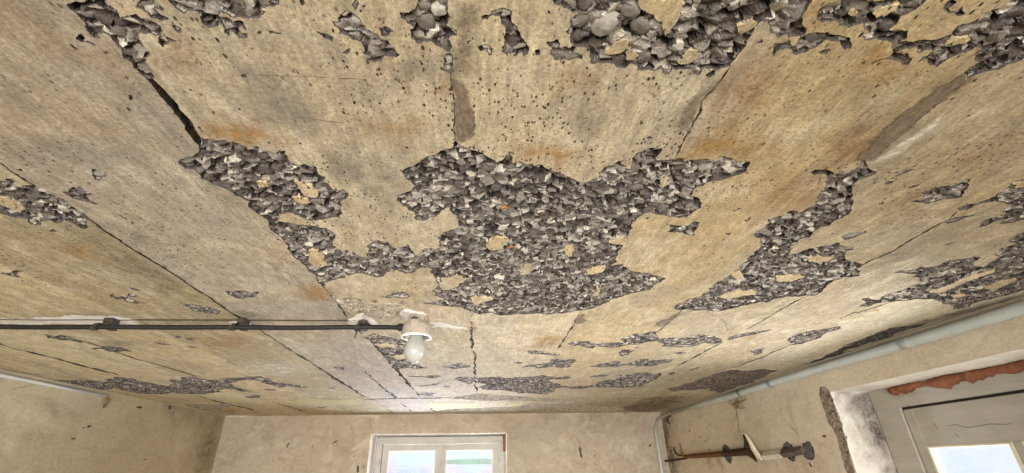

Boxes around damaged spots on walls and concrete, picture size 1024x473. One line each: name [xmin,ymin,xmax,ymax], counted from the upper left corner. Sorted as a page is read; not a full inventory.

spalling [67,0,282,79]
spalling [309,0,399,63]
spalling [399,0,1024,78]
spalling [0,169,98,232]
spalling [178,136,750,320]
spalling [673,160,877,311]
spalling [860,179,1024,309]
spalling [43,334,131,352]
spalling [364,330,778,414]